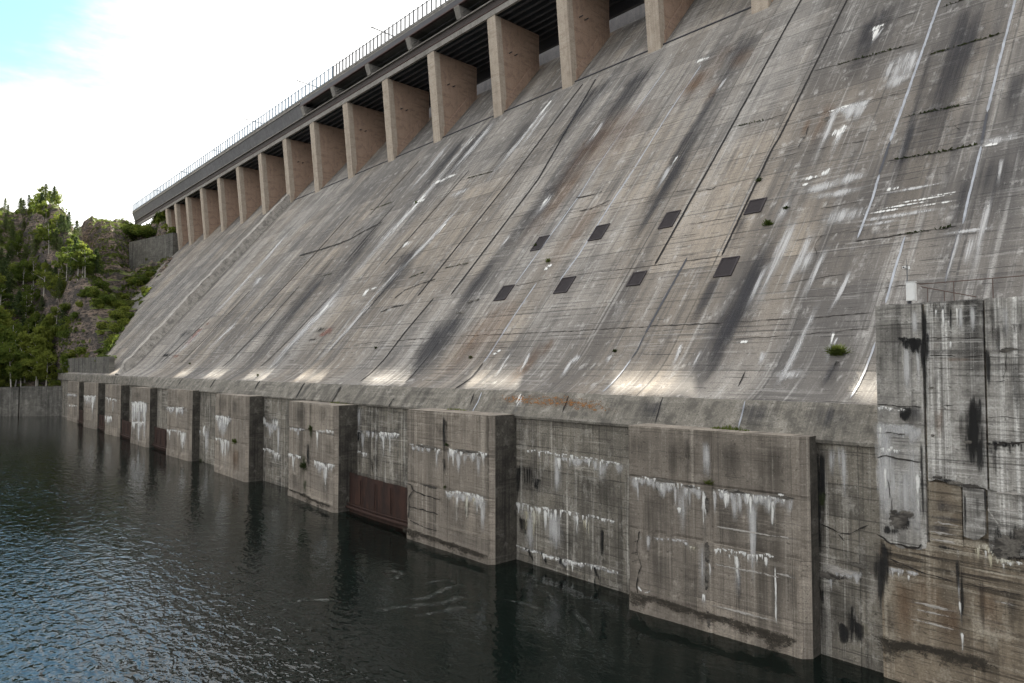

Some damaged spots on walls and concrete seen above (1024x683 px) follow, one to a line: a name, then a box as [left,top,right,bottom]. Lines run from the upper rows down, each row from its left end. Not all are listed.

damp [132,401,147,440]
damp [202,415,229,454]
damp [263,418,333,484]
damp [357,412,400,469]
damp [527,450,621,485]
damp [878,301,999,510]
damp [965,397,1022,471]
crack [406,483,440,531]
damp [446,491,484,520]
damp [516,467,618,584]
crack [631,531,648,593]
damp [626,477,795,653]